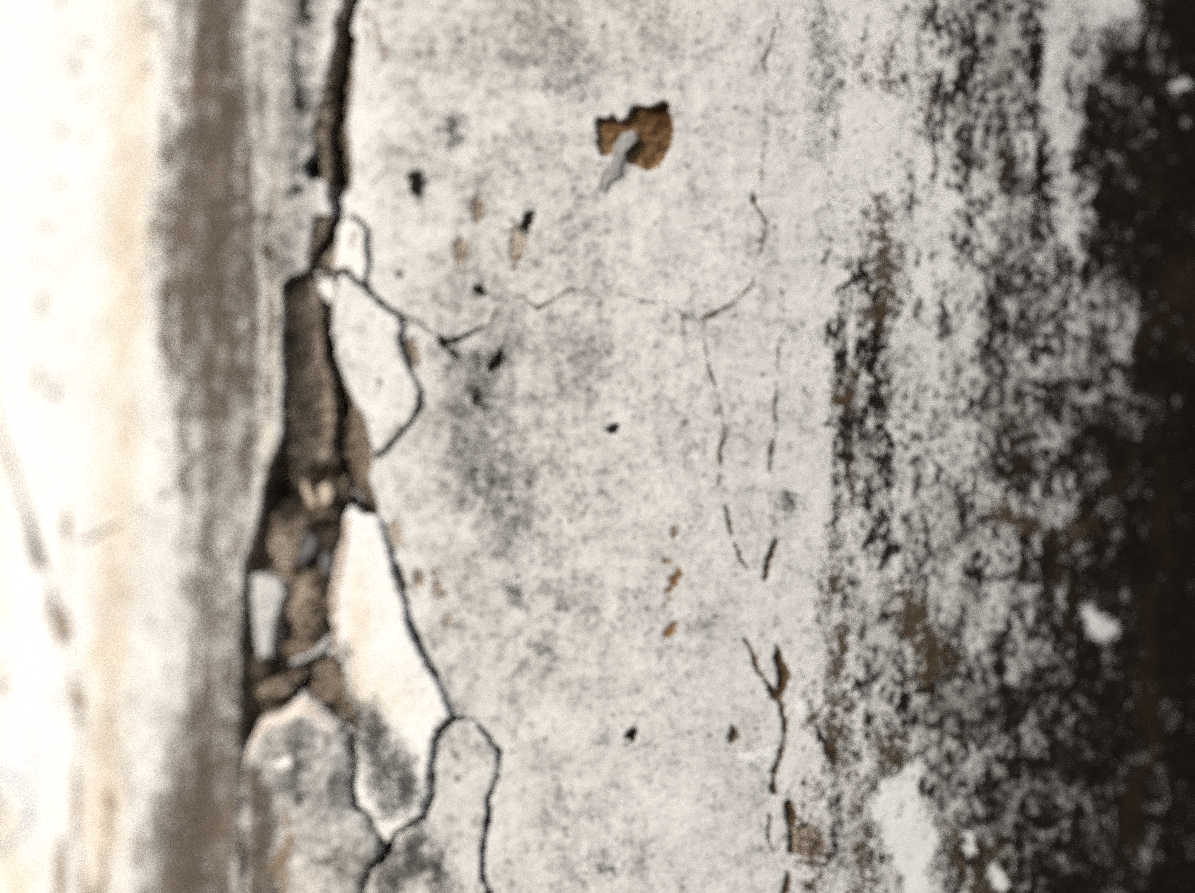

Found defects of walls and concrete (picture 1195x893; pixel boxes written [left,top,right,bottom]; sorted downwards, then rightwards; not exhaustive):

damp [437,108,468,154]
spalling [452,235,471,269]
spalling [473,285,487,297]
spalling [509,212,536,271]
spalling [596,102,675,193]
crack [0,424,209,662]
damp [130,0,460,893]
spalling [237,271,363,752]
peeling [393,569,449,602]
crack [255,0,784,890]
damp [800,0,1195,893]
crack [743,639,825,893]